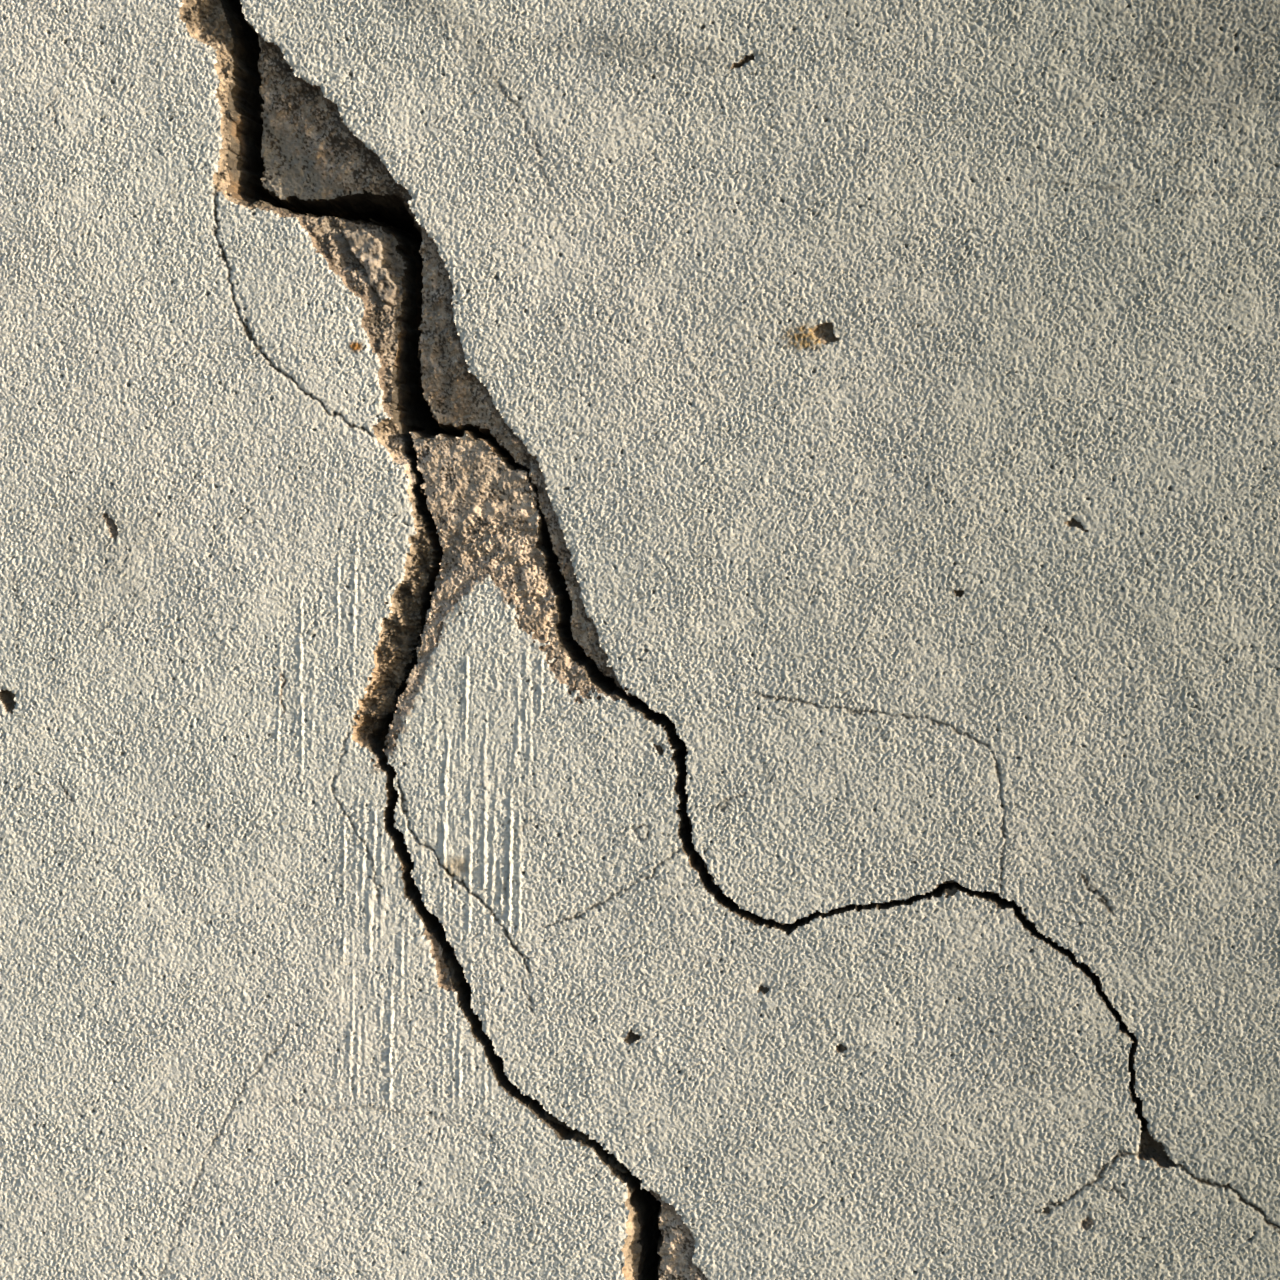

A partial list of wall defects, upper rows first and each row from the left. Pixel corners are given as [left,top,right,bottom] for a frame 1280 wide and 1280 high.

flaking render [179,0,631,768]
crack [212,0,1149,1280]
flaking render [621,1186,708,1280]
crack [1175,1164,1279,1229]